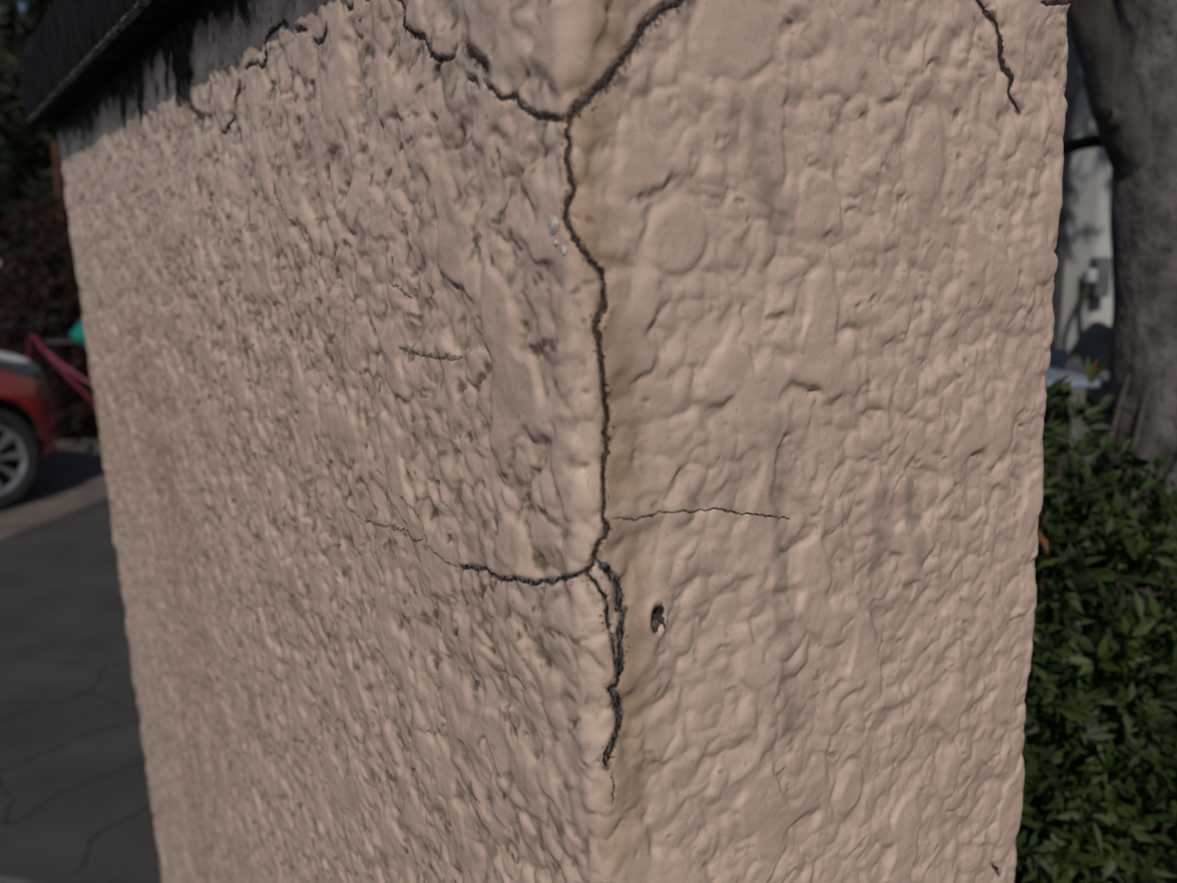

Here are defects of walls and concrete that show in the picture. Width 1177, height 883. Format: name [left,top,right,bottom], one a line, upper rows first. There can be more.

damp [56,0,251,159]
crack [180,19,327,134]
crack [977,0,1021,114]
crack [1041,0,1071,8]
crack [276,196,320,268]
crack [345,0,791,803]